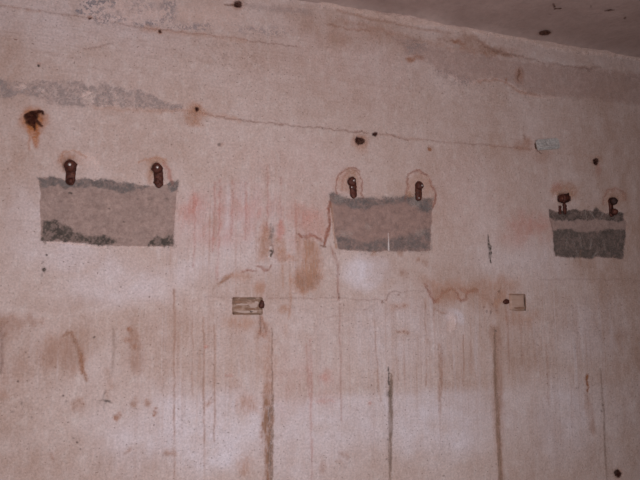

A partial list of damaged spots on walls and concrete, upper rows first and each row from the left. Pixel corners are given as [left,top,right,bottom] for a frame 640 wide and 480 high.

corrosion [24,110,44,145]
water stain [262,397,273,480]